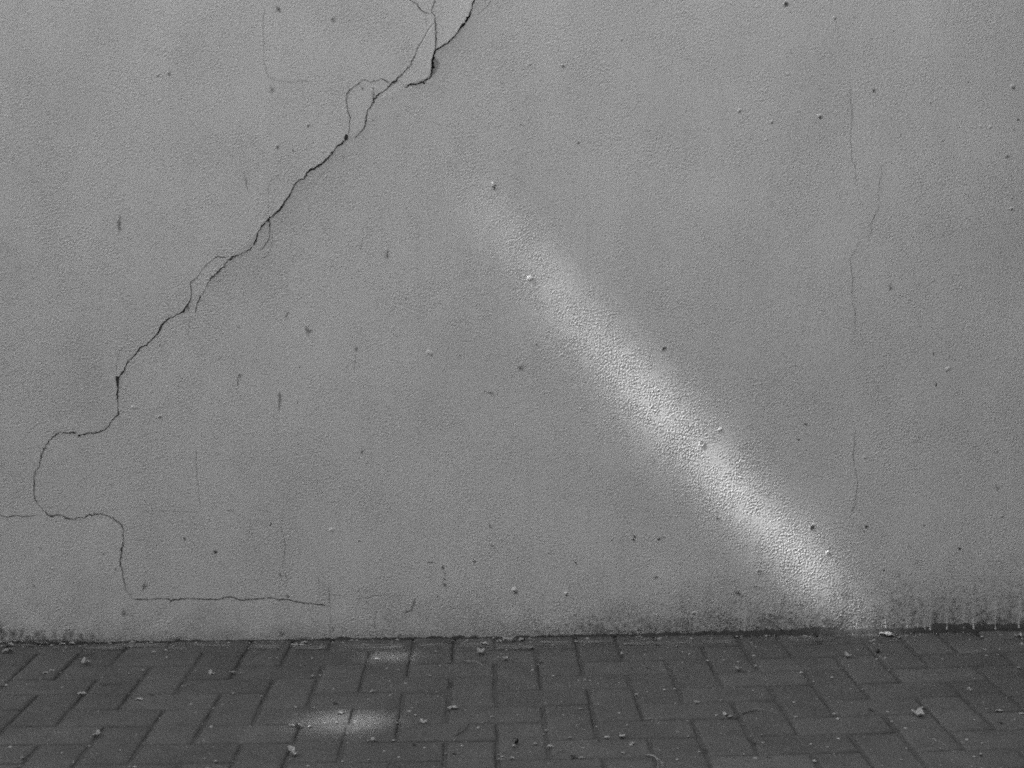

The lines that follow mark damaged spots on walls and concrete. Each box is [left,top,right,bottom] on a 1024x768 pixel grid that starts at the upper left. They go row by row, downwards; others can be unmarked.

crack [1,0,475,606]